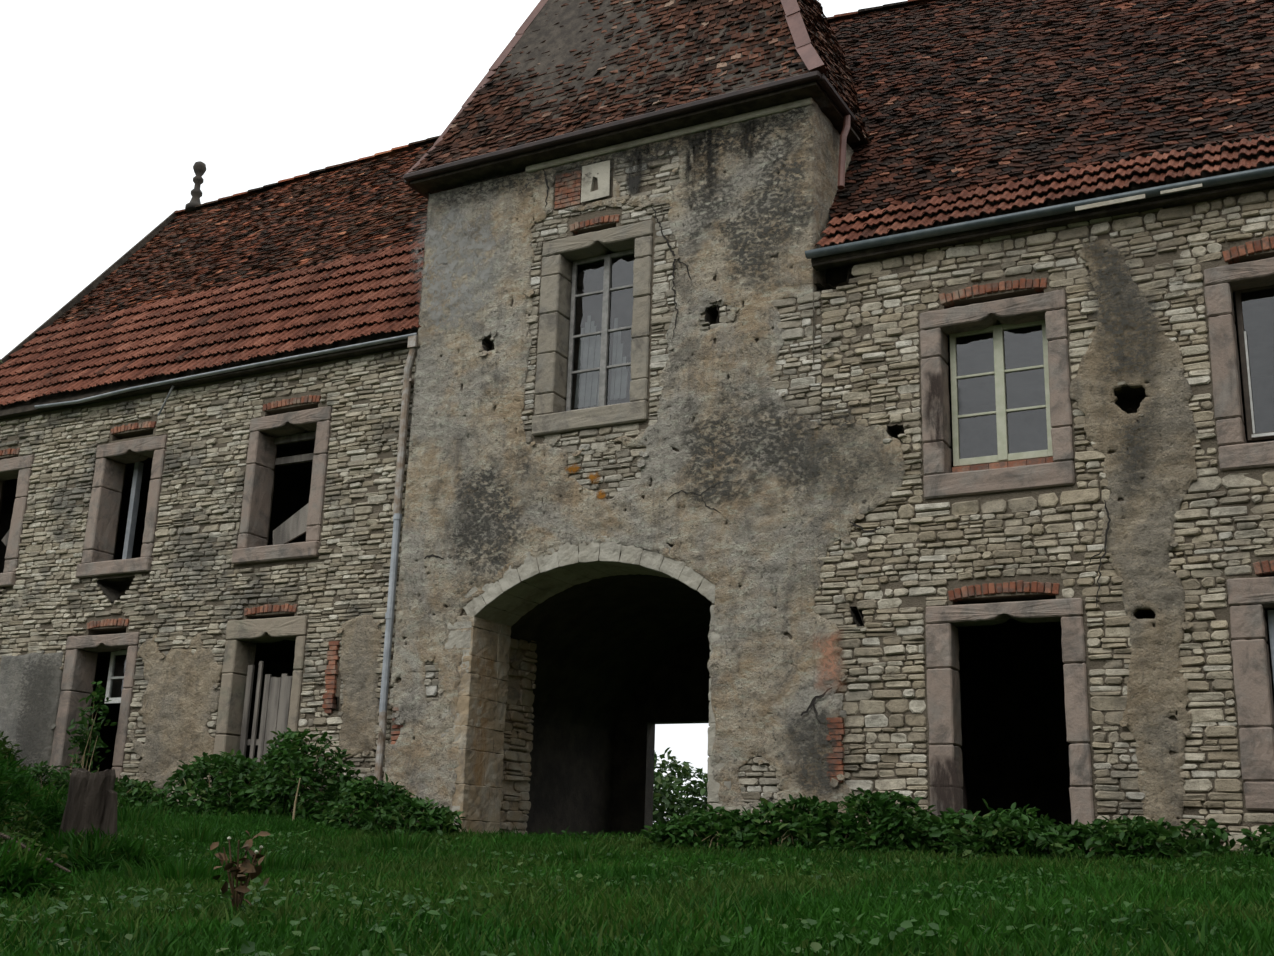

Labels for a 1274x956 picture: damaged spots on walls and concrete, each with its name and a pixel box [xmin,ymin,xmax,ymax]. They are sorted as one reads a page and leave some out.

flaking render [521,150,681,500]
flaking render [695,297,743,332]
flaking render [769,263,909,813]
flaking render [1069,239,1198,839]